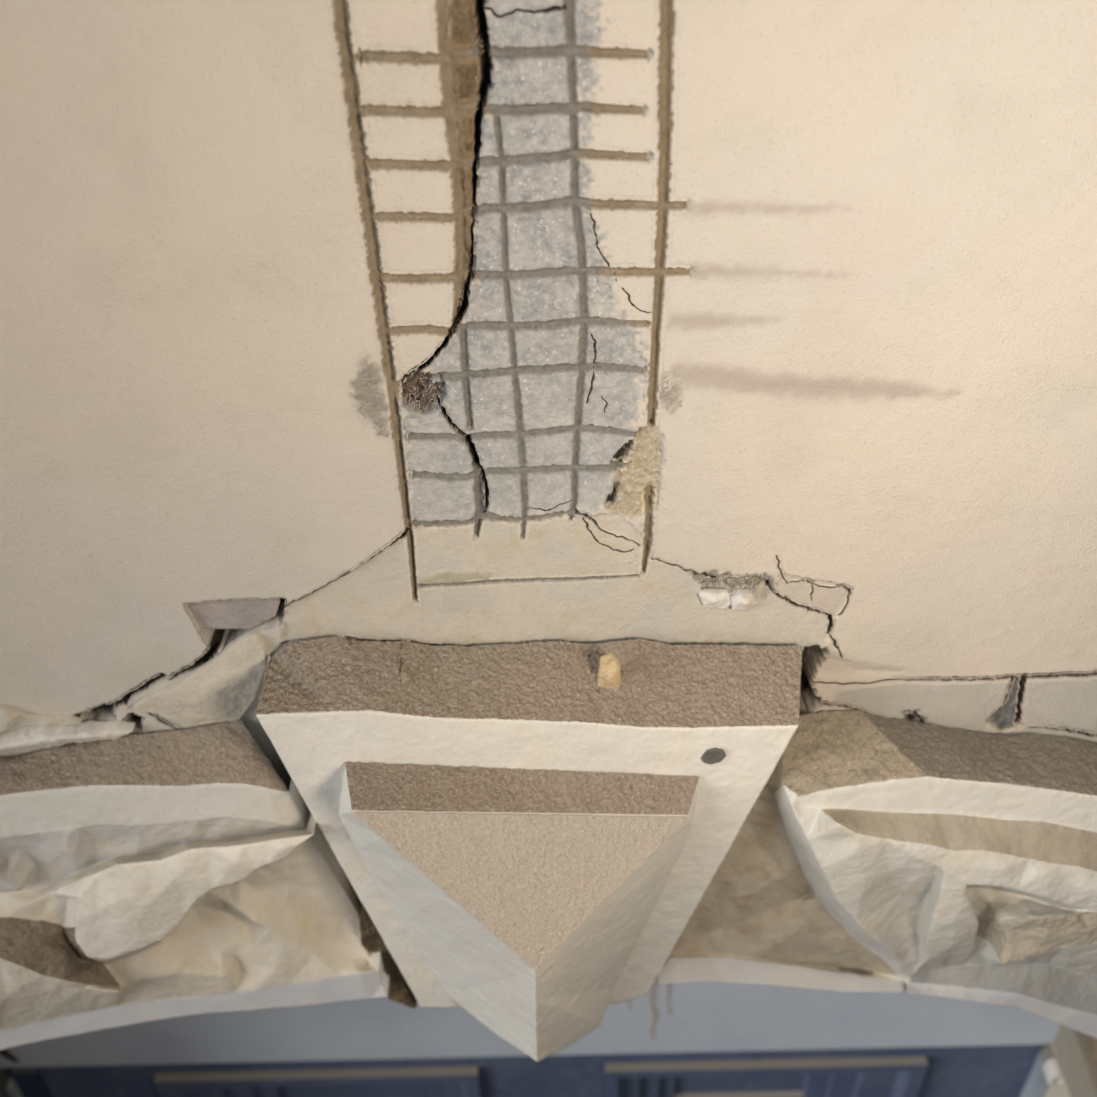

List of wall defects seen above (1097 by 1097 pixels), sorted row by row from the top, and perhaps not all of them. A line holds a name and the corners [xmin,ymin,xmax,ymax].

spalling [487,0,562,43]
spalling [490,62,564,101]
crack [401,0,567,383]
spalling [469,218,499,268]
spalling [465,285,503,319]
crack [435,395,491,513]
crack [283,527,410,609]
spalling [183,330,927,796]
crack [532,499,717,578]
crack [75,629,230,730]
crack [766,555,1097,738]
peeling [0,701,144,755]